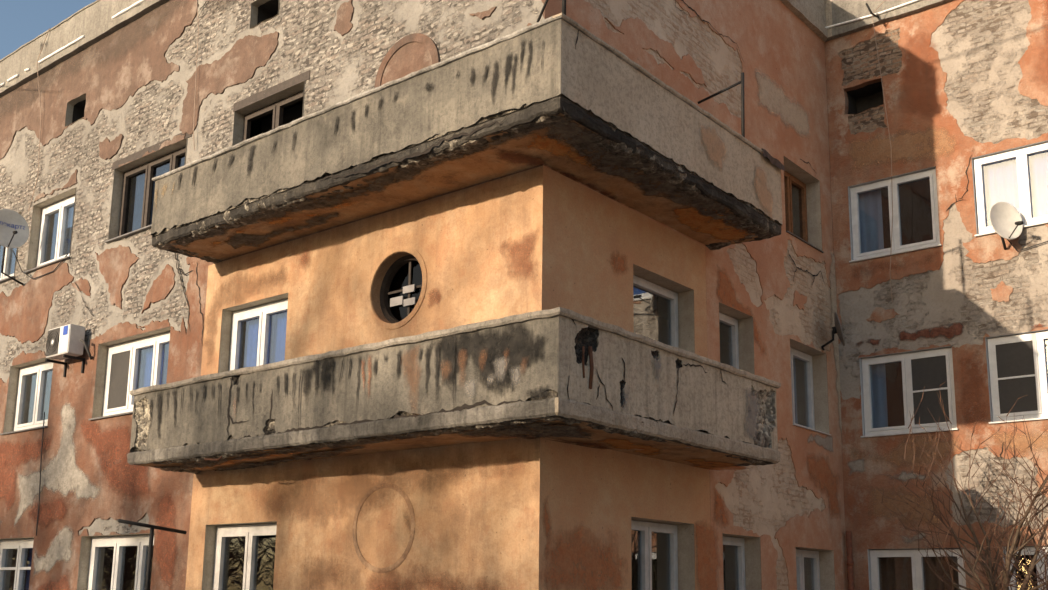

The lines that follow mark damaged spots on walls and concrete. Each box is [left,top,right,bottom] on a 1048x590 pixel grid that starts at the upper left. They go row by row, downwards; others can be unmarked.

crack [675,0,742,57]
water stain [456,41,544,98]
peeling [0,0,1048,401]
water stain [277,357,361,427]
water stain [373,350,401,376]
water stain [419,324,544,399]
crack [596,358,625,410]
crack [641,363,726,423]
peeling [14,404,99,525]
peeling [153,416,672,474]
peeling [698,385,826,590]
peeling [945,447,1048,530]